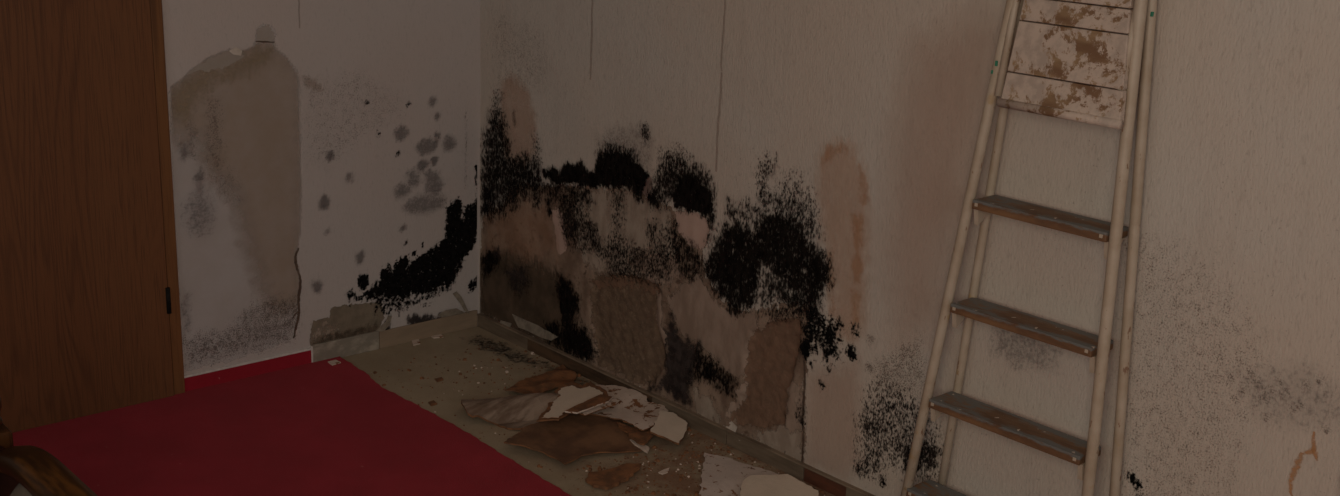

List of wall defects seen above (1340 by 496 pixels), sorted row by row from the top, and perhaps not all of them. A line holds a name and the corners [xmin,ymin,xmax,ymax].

damp [347,89,944,488]
peeling [480,184,811,463]
corrosion [1289,431,1318,496]